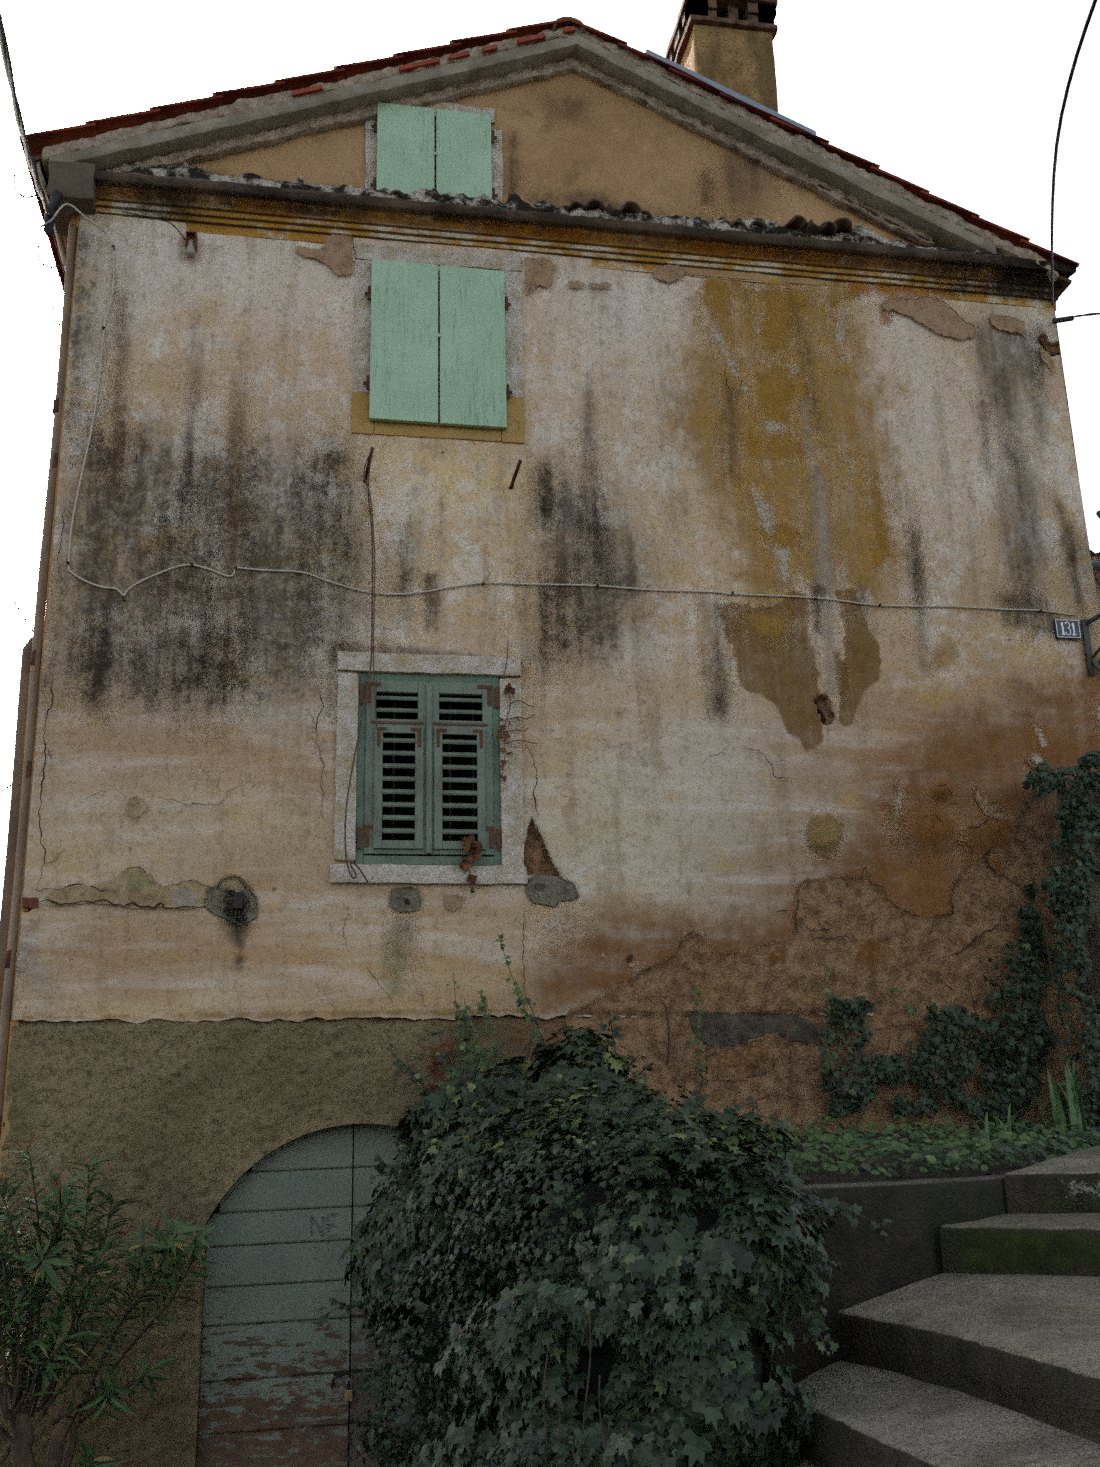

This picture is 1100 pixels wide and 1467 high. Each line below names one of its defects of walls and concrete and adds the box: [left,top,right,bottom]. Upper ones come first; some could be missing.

flaking render [990,313,1059,373]
water stain [43,231,357,723]
water stain [535,463,647,668]
water stain [1056,504,1083,610]
spalling [22,866,257,910]
spalling [524,817,579,906]
crack [776,910,844,940]
spalling [565,786,1098,1136]
crack [937,923,1001,991]